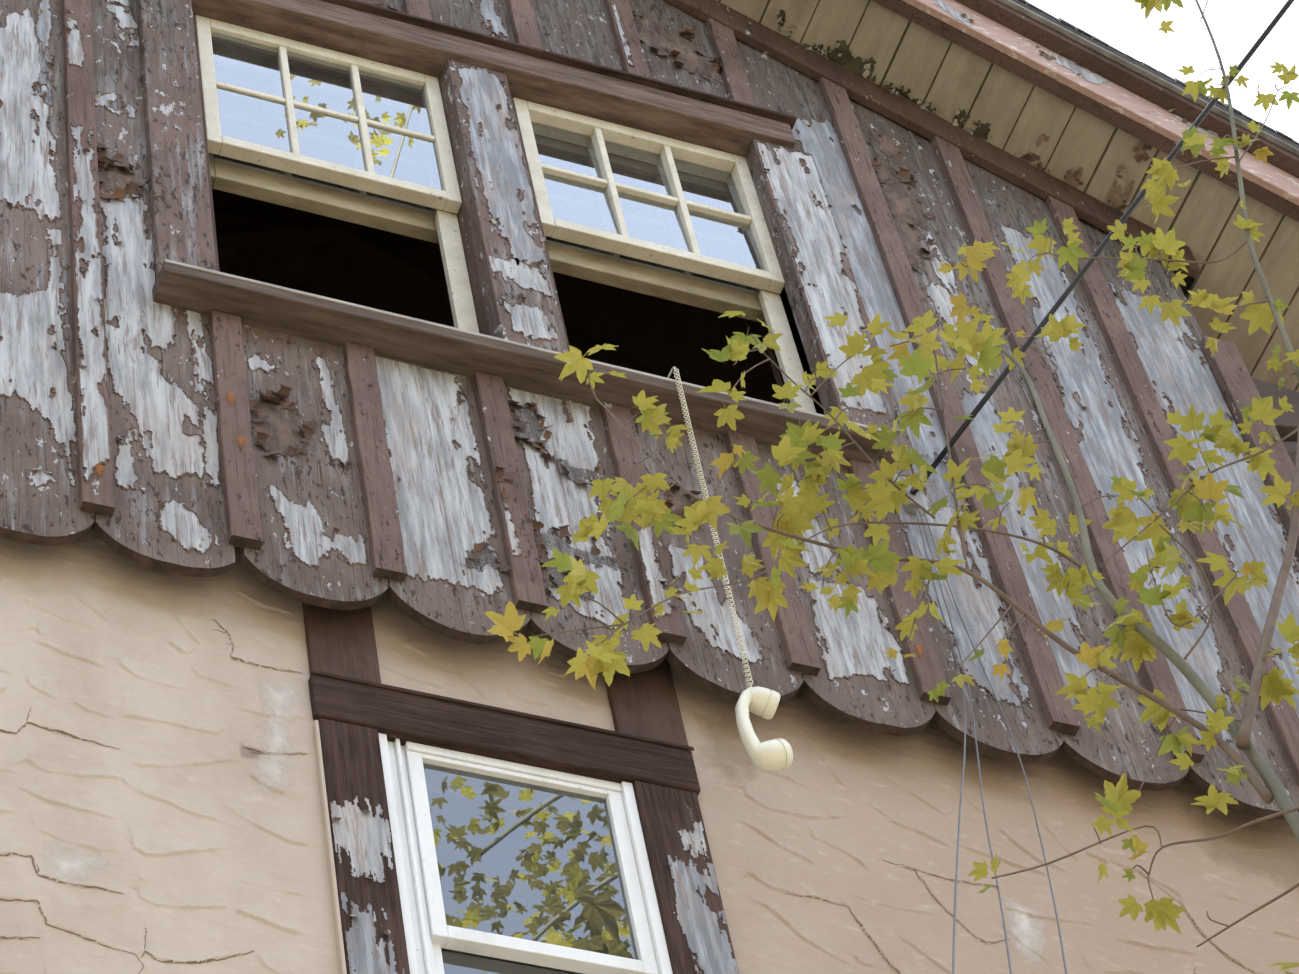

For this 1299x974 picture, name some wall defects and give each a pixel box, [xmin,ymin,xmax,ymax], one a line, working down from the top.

peeling [0,0,221,555]
peeling [244,352,352,468]
peeling [268,484,368,568]
peeling [452,62,559,342]
peeling [375,356,769,664]
peeling [756,114,1034,709]
peeling [959,388,1098,717]
peeling [1000,223,1234,743]
peeling [1108,281,1299,717]
peeling [330,796,393,883]
peeling [341,892,404,974]
peeling [668,821,739,974]